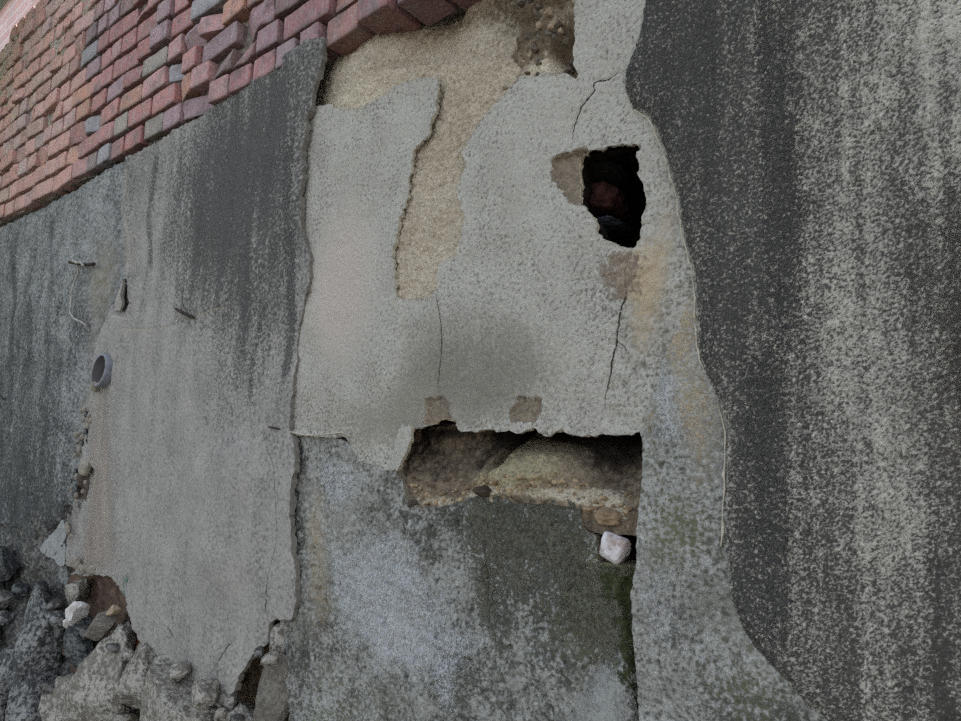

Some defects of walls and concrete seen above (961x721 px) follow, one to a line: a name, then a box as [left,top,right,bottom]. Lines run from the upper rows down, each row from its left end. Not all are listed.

spalling [316,0,578,300]
spalling [551,146,588,206]
crack [572,74,616,133]
crack [605,257,629,400]
water stain [625,0,817,695]
water stain [893,193,961,496]
peeling [393,395,451,471]
spalling [40,519,131,649]